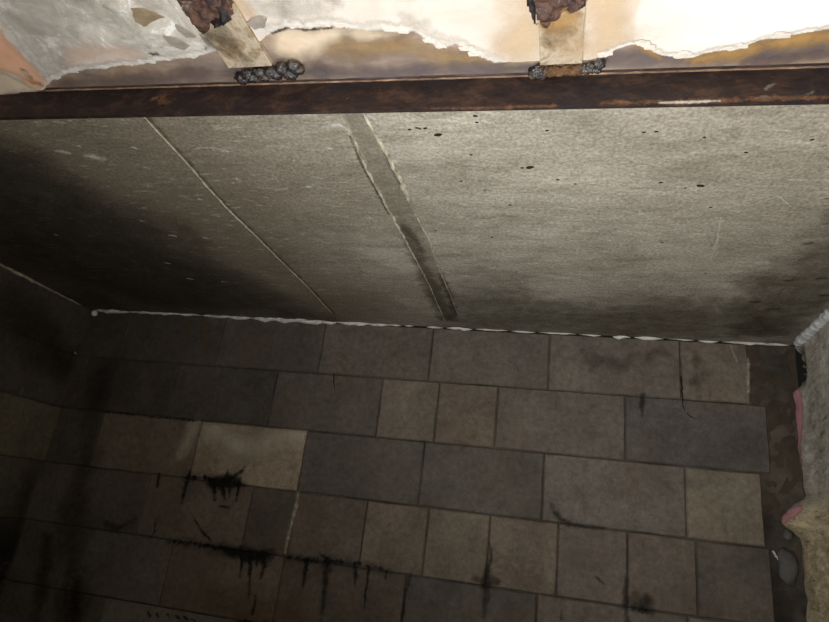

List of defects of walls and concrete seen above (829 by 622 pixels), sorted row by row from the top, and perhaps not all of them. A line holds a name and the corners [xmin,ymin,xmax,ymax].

peeling [0,0,216,95]
peeling [210,0,232,29]
flaking render [247,16,500,62]
corrosion [315,39,512,79]
corrosion [502,16,539,56]
peeling [527,0,538,25]
corrosion [588,0,666,64]
flaking render [597,26,829,59]
damp [182,468,244,509]
damp [168,519,272,622]
damp [287,555,387,611]